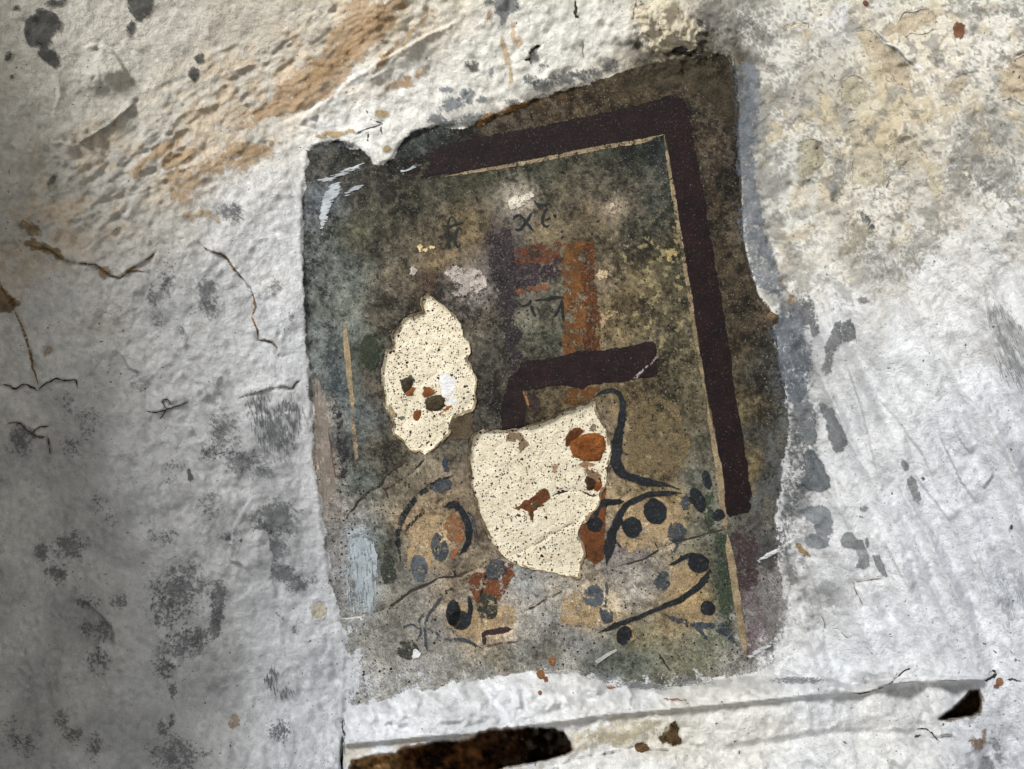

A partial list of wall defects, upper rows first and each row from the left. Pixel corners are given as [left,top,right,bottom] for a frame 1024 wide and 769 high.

crack [0,283,78,391]
crack [43,248,156,278]
crack [199,242,277,348]
crack [147,399,188,419]
spalling [381,293,612,580]